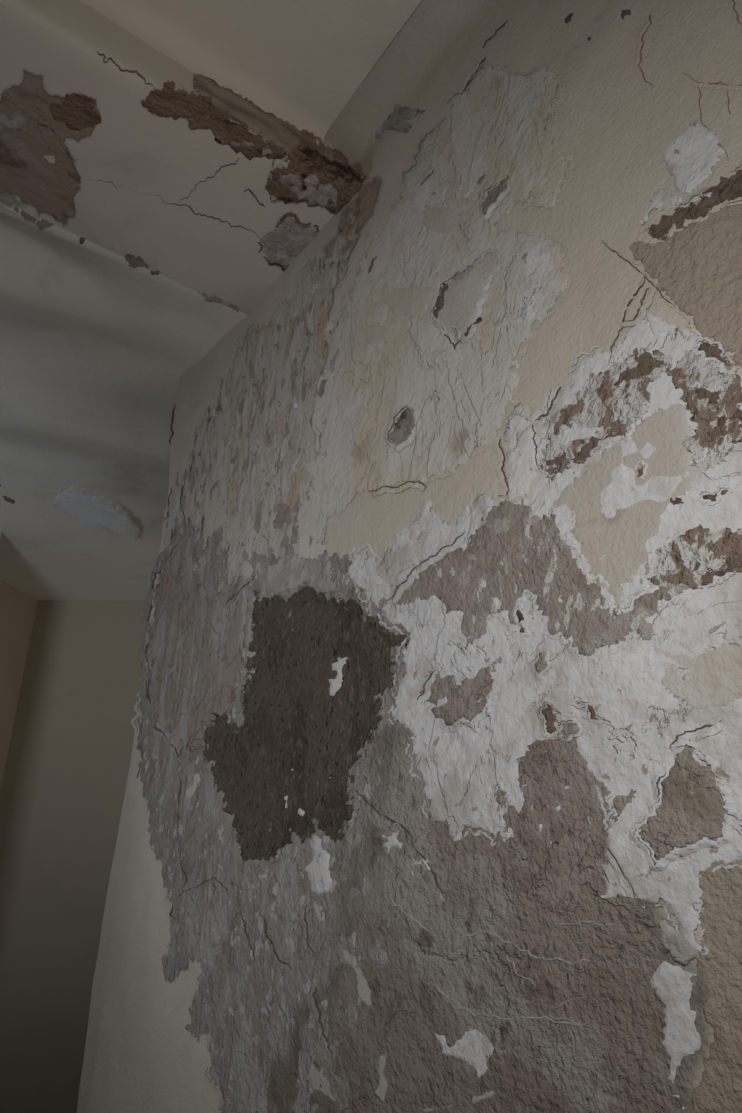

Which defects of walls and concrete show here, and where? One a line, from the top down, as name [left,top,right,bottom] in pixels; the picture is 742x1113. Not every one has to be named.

crack [457,21,507,95]
crack [633,14,653,89]
crack [680,72,742,161]
crack [93,158,261,239]
flaking render [125,254,159,275]
flaking render [131,62,742,1113]
crack [347,789,447,907]